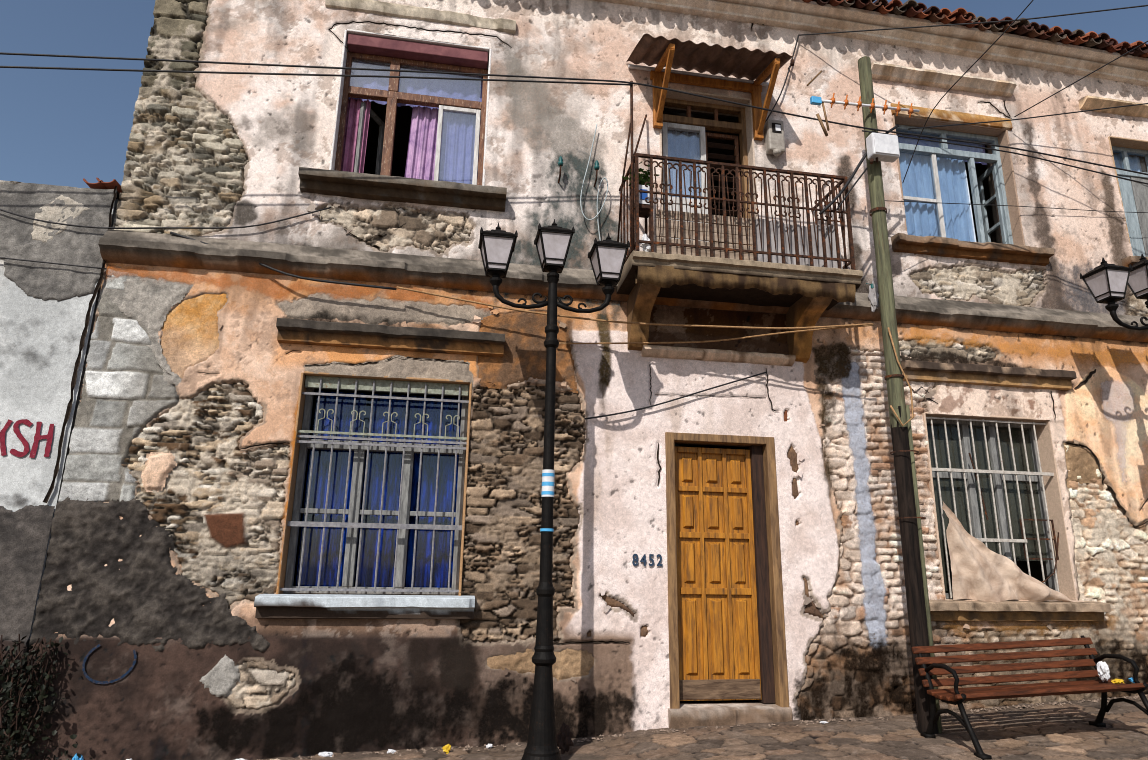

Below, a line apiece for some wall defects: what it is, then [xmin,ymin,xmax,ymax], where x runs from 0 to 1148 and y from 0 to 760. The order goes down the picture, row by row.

spalling [112,0,249,237]
spalling [306,202,473,254]
spalling [910,266,1045,307]
spalling [58,268,291,608]
damp [196,638,534,758]
spalling [460,303,594,683]
damp [554,687,635,739]
spalling [796,347,915,720]
damp [794,641,917,721]
spalling [903,381,945,600]
spalling [931,439,1148,710]
crack [1051,369,1148,529]